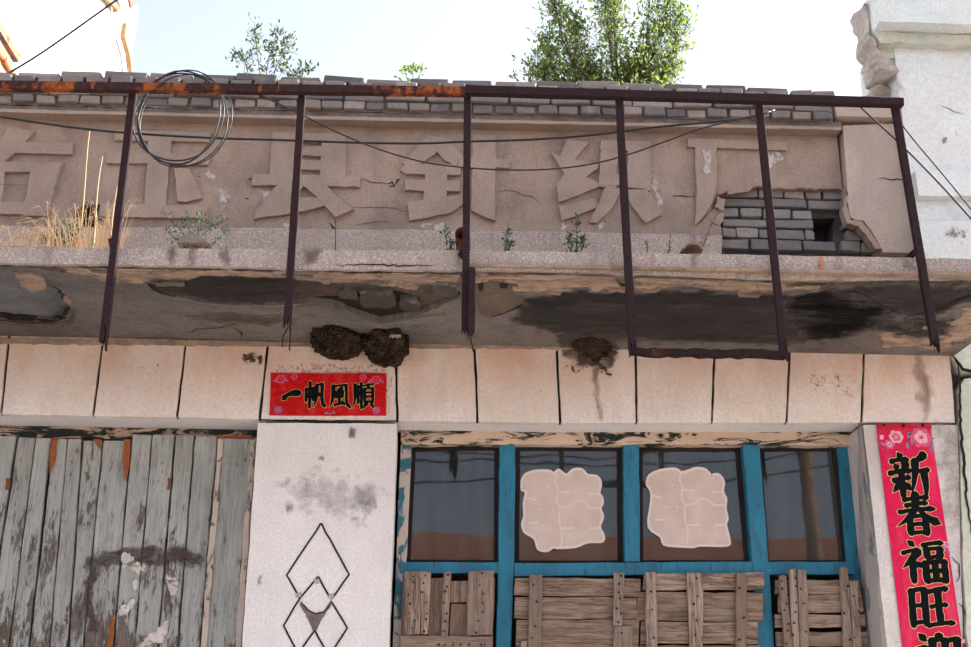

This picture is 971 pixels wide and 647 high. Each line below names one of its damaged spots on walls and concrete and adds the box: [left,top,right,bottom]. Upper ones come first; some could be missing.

spalling [713,182,881,255]
spalling [0,270,76,330]
spalling [67,267,460,329]
leakage [512,283,971,345]
leakage [918,371,929,403]